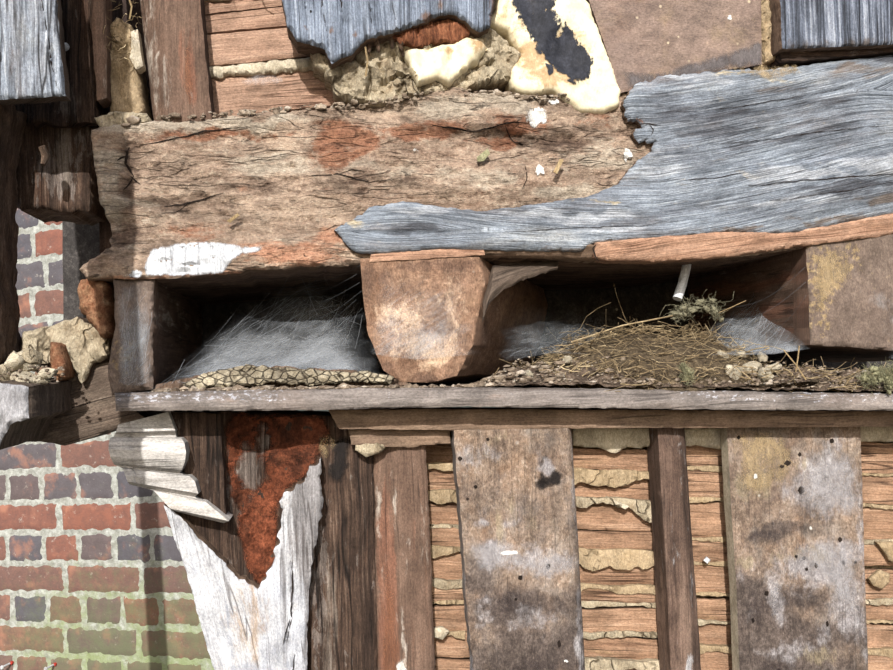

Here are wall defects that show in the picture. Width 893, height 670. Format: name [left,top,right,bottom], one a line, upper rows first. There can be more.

crack [117,127,243,189]
water stain [742,434,791,488]